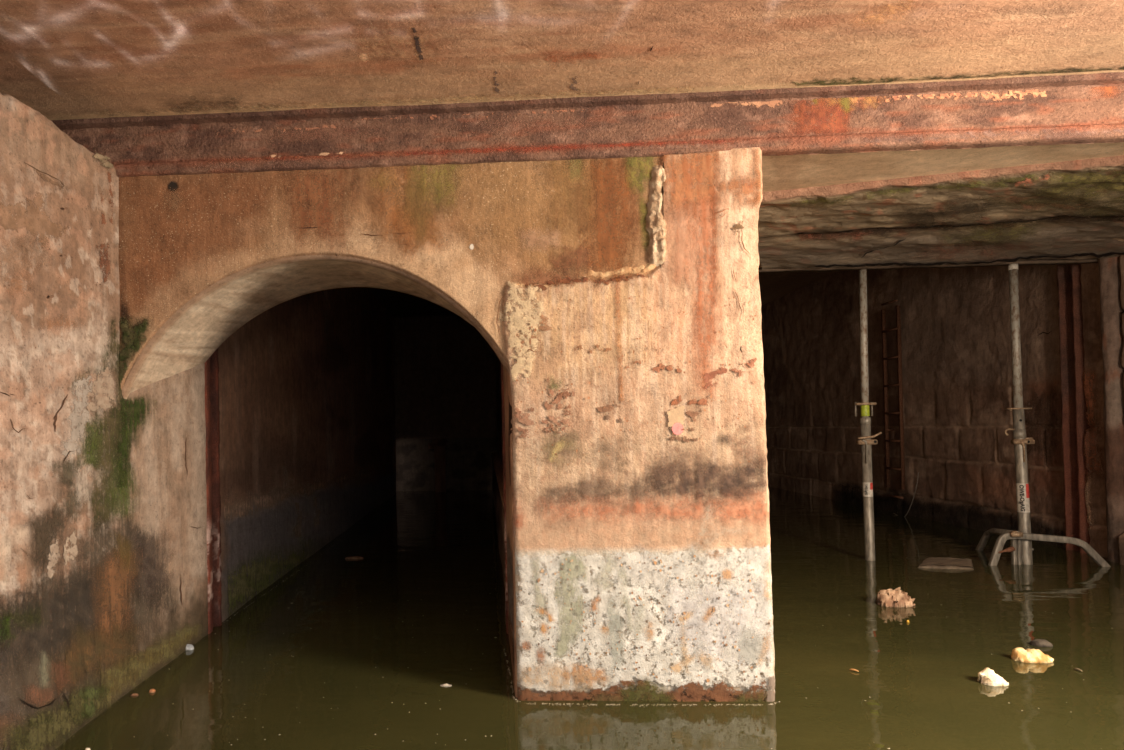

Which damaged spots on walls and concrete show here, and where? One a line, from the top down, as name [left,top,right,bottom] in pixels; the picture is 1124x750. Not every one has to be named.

corrosion [232,115,440,133]
corrosion [237,151,458,161]
peeling [711,100,782,108]
peeling [820,89,1047,104]
damp [798,188,1124,239]
peeling [499,165,668,383]
corrosion [527,140,762,395]
peeling [514,378,631,459]
peeling [647,358,757,445]
damp [837,483,1063,546]
damp [506,426,774,692]
damp [0,510,176,750]